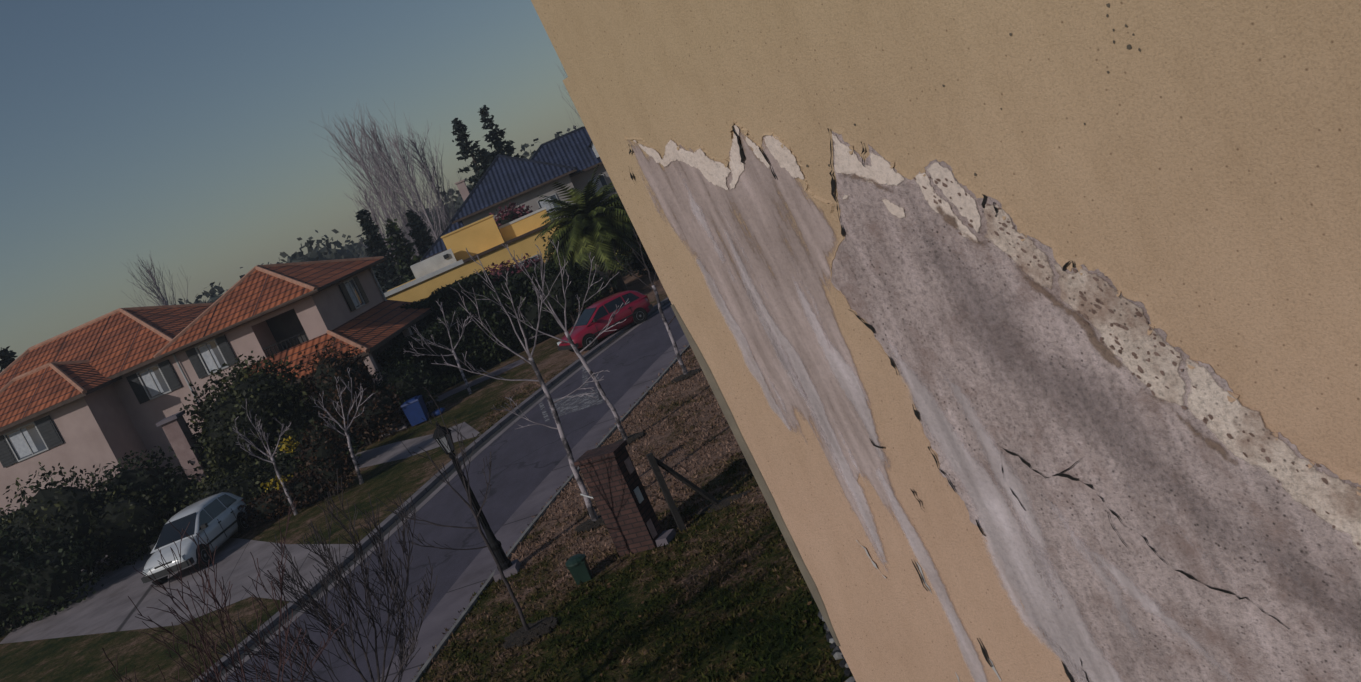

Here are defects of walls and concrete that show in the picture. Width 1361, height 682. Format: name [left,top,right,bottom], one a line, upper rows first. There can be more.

peeling [624,119,1361,682]
crack [1001,447,1289,629]